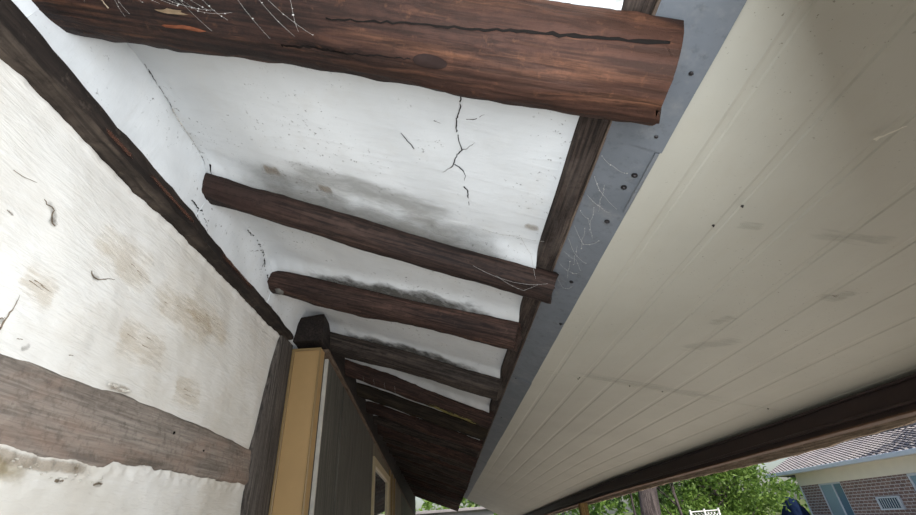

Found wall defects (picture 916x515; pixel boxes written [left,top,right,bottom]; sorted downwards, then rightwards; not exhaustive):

crack [435,97,481,203]
water stain [267,176,472,251]
flaking render [0,450,103,486]